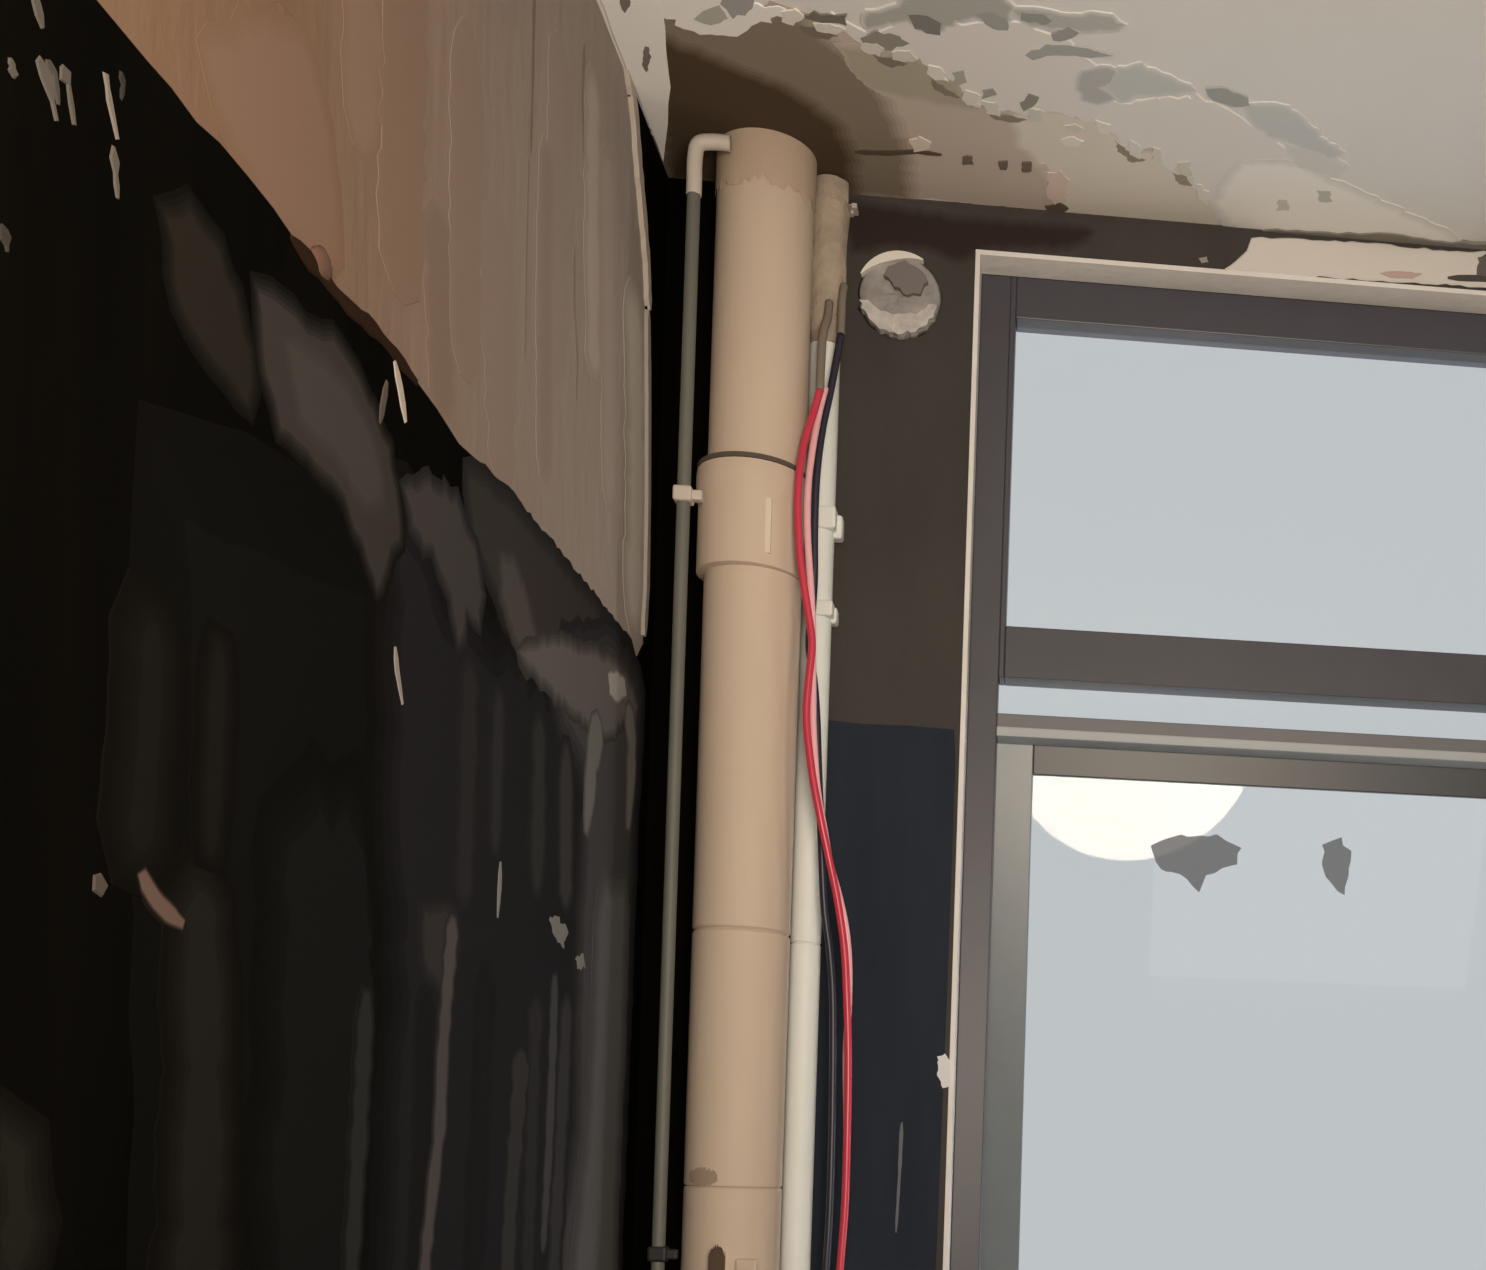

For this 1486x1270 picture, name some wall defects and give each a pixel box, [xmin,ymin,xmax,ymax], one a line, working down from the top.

water stain [649,0,1097,265]
peeling [659,0,1486,288]
water stain [96,0,646,1270]
water stain [0,1085,63,1270]